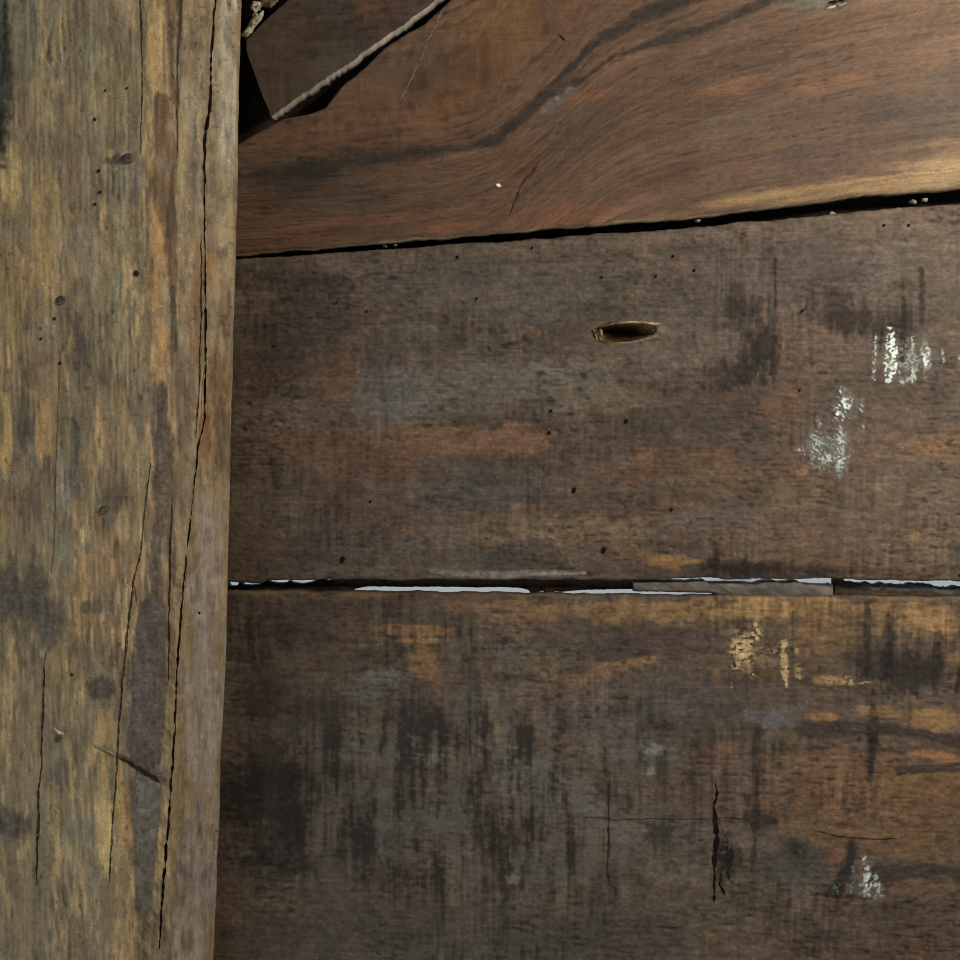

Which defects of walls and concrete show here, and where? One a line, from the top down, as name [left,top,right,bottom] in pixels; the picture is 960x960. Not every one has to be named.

crack [137,0,145,143]
crack [159,0,217,949]
crack [35,654,46,884]
crack [109,465,151,884]
crack [583,779,743,903]